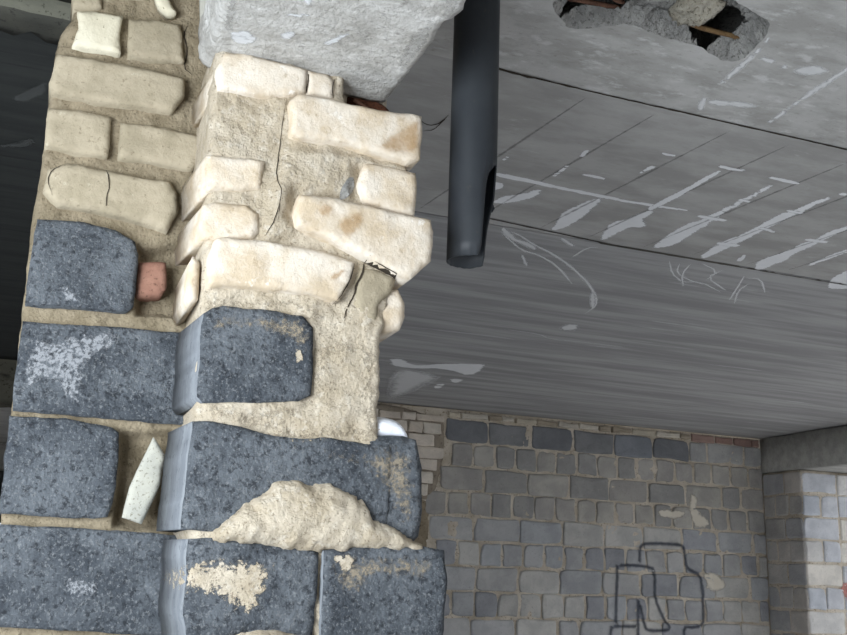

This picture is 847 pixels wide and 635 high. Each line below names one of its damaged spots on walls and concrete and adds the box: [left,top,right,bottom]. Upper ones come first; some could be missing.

spalling [553,0,770,62]
corrosion [346,97,389,111]
crack [265,99,287,236]
crack [332,260,397,318]